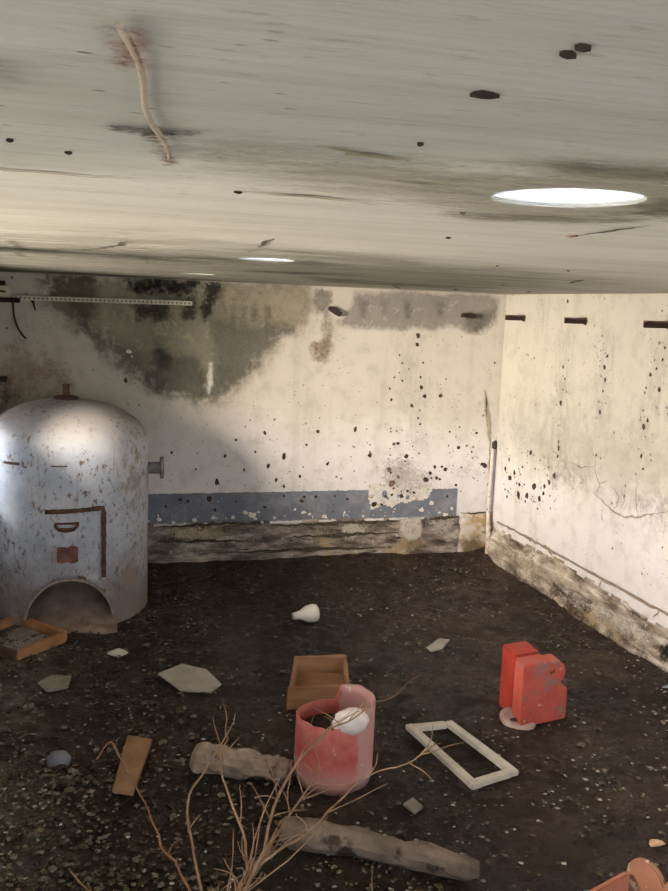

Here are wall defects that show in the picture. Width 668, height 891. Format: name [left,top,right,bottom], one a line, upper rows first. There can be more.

leakage [203,146,668,223]
leakage [0,246,142,258]
spalling [148,404,668,673]